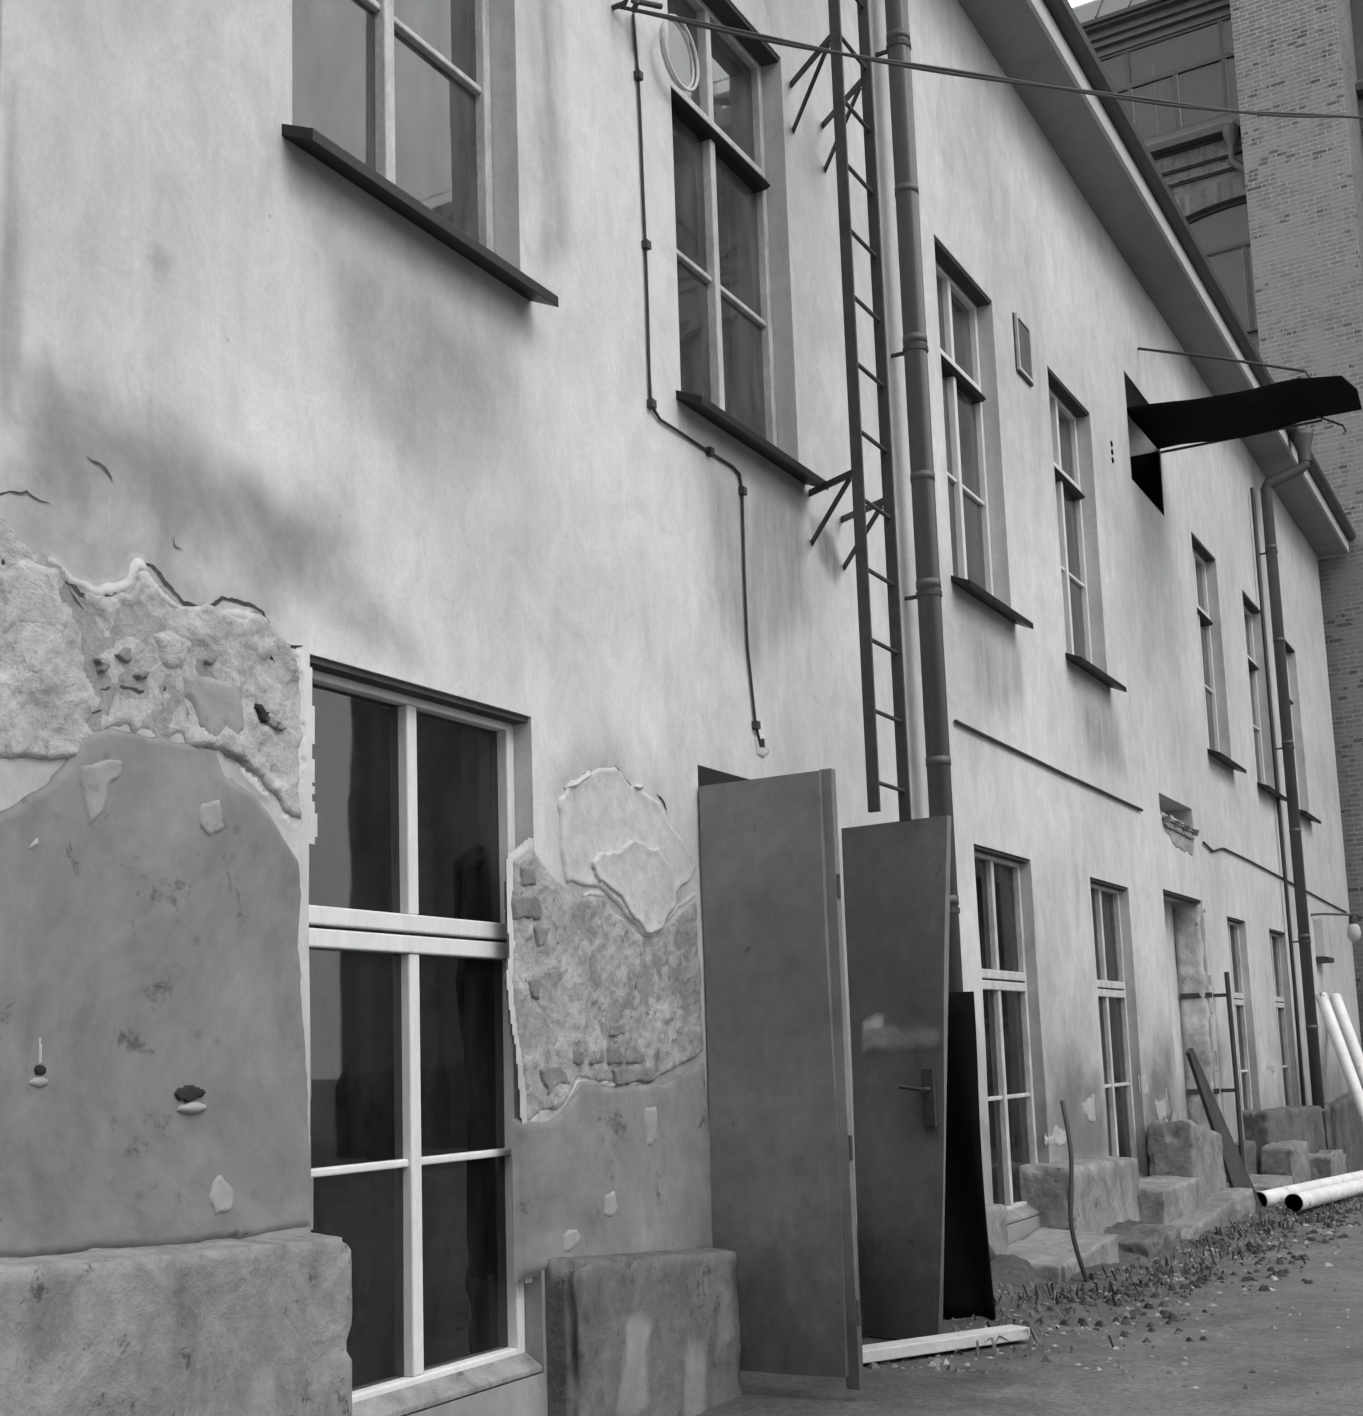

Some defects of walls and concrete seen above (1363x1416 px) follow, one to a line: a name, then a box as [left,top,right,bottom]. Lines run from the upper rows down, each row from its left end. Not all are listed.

crack [0,490,50,504]
spalling [0,518,317,844]
spalling [29,1038,48,1088]
spalling [504,767,704,1125]